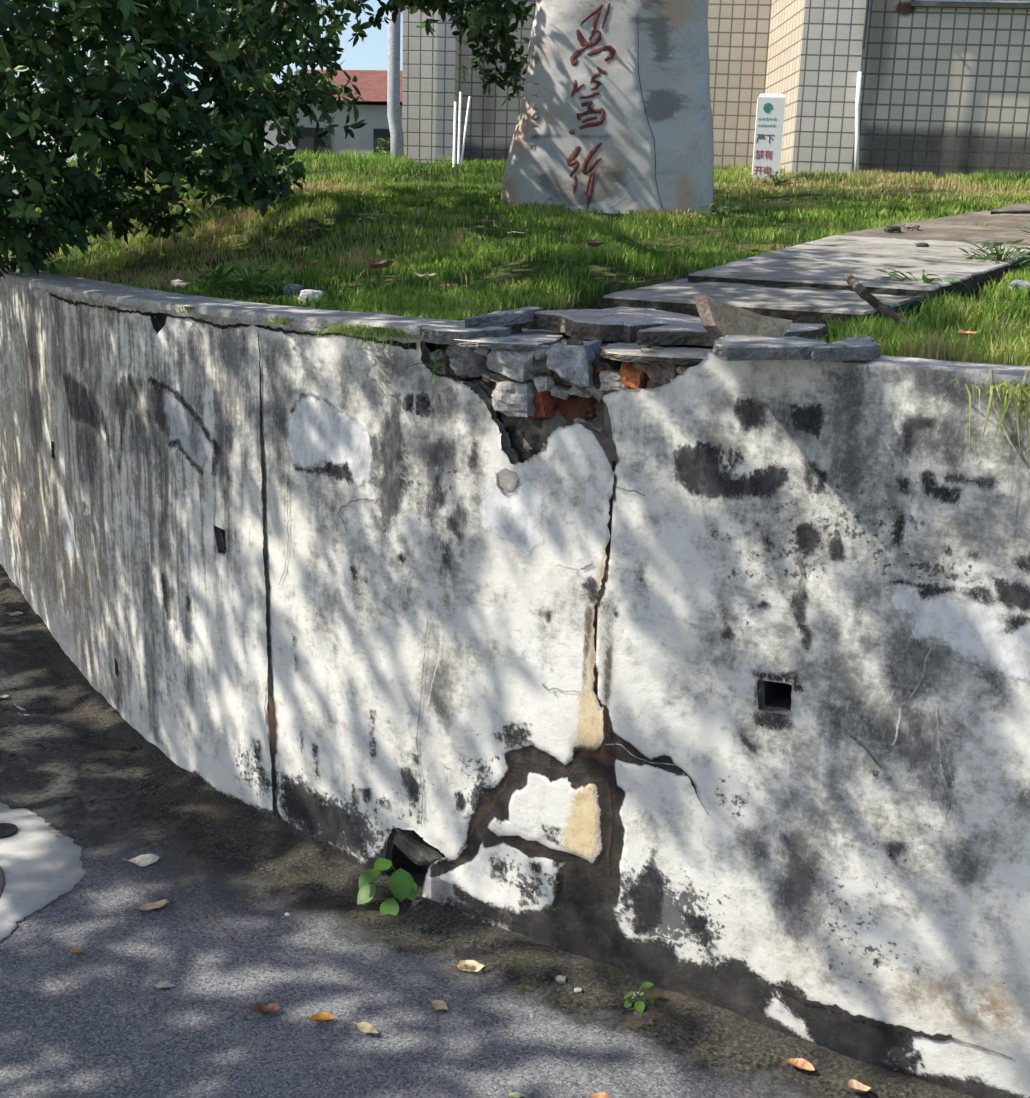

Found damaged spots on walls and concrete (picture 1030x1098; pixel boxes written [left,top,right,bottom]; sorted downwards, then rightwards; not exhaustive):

damp [28,297,170,735]
peeling [148,377,219,476]
crack [50,293,416,816]
peeling [287,393,372,485]
flaking render [593,402,619,468]
damp [672,441,788,503]
damp [733,398,824,439]
damp [788,522,844,650]
damp [919,471,998,505]
crack [429,461,708,912]
spalling [391,839,504,928]
damp [480,836,1030,1098]